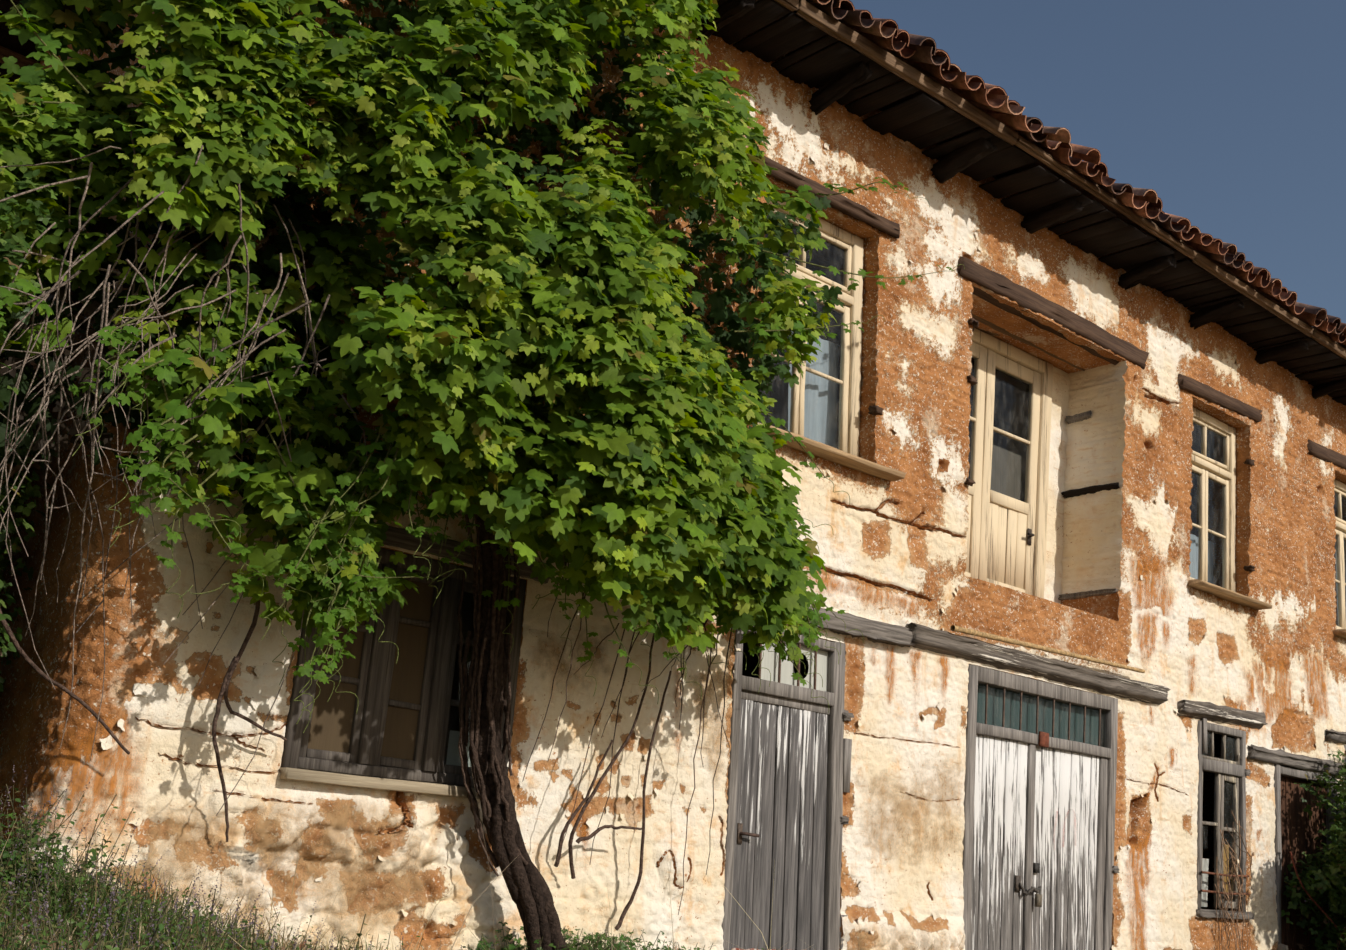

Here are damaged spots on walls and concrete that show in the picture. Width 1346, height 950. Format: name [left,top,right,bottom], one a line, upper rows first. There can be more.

peeling [440,19,765,383]
spalling [0,261,305,849]
spalling [844,636,867,734]
peeling [919,702,968,730]
peeling [1271,689,1331,754]
spalling [129,806,284,874]
spalling [266,791,466,950]
spalling [434,802,498,872]
spalling [843,782,856,832]
spalling [841,852,949,950]
spalling [1112,709,1155,950]
spalling [1188,728,1278,950]